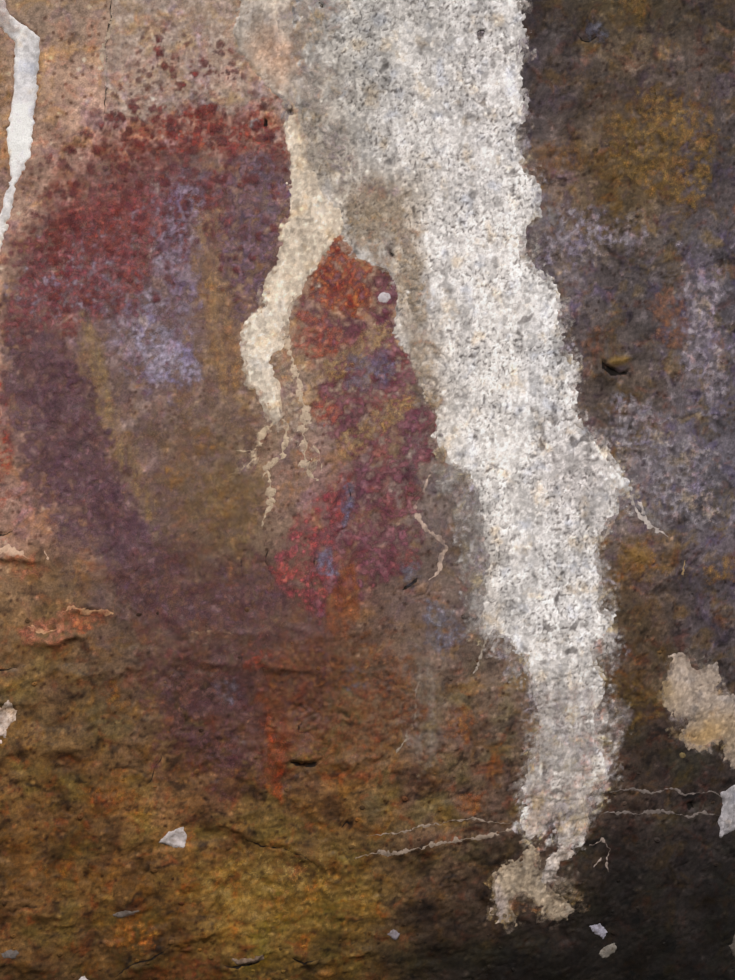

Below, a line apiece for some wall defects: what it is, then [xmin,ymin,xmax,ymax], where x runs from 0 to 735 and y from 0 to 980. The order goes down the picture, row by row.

crack [103,0,112,115]
rust [298,177,443,411]
rust [339,396,411,458]
spalling [0,700,17,744]
peeling [657,652,735,769]
peeling [159,827,187,848]
spalling [718,785,735,838]